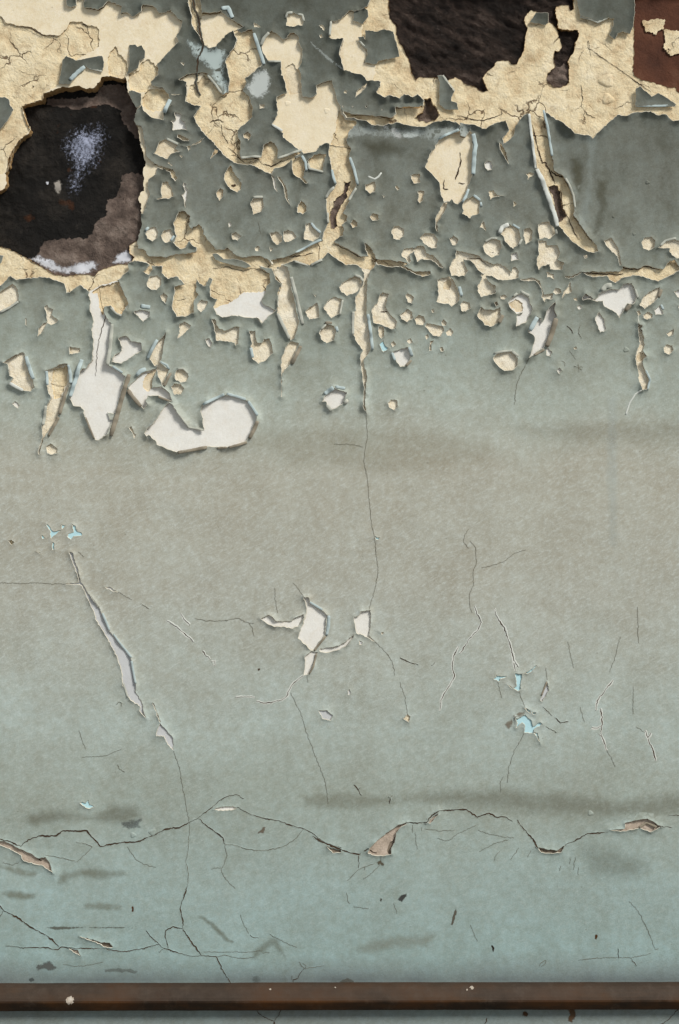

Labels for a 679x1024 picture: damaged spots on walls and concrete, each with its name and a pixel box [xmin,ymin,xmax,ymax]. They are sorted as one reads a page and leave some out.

water stain [46,128,103,193]
water stain [32,256,95,274]
water stain [112,252,131,263]
flaking render [0,0,679,455]
peeling [261,597,384,675]
crack [378,529,639,860]
peeling [493,665,537,691]
crack [0,756,381,983]
crack [560,831,608,870]
crack [583,902,657,966]